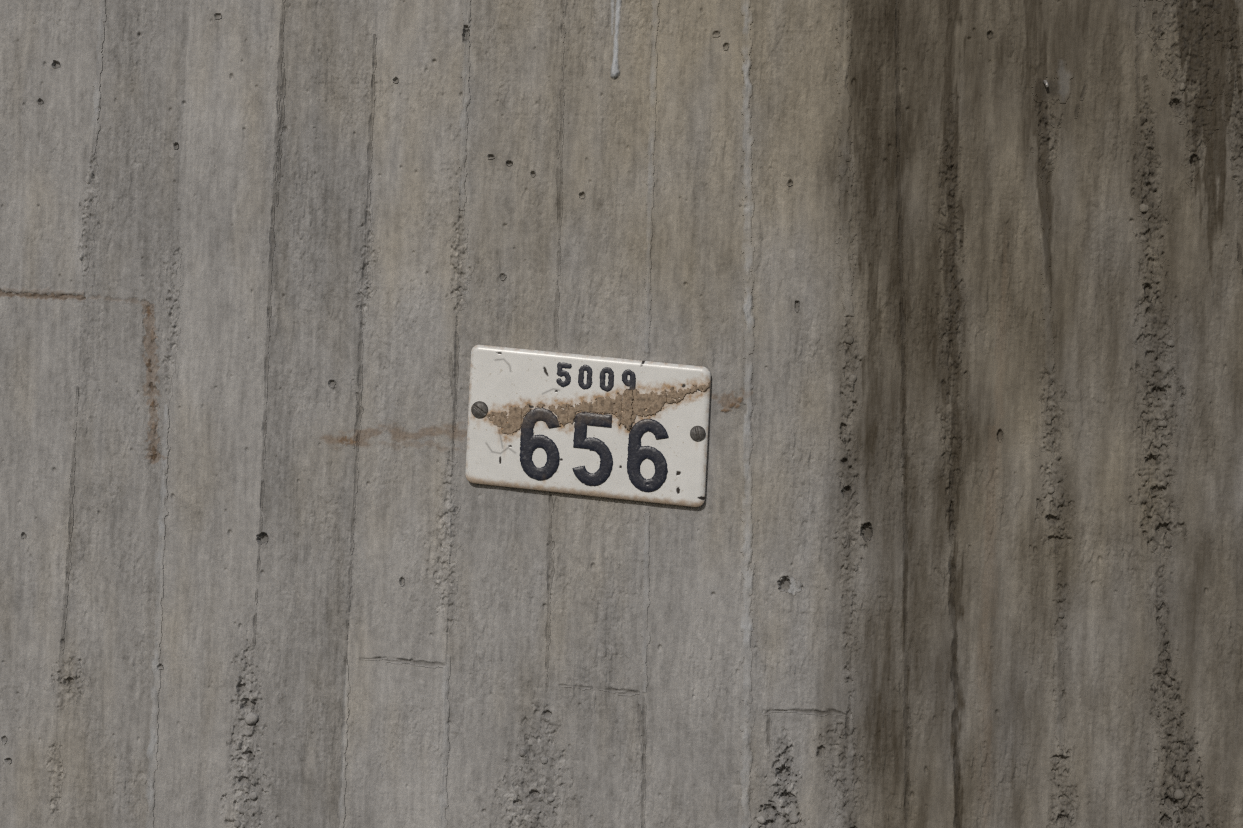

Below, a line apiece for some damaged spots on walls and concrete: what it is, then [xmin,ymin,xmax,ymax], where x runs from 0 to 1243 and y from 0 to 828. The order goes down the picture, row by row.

leakage [798,0,1243,828]